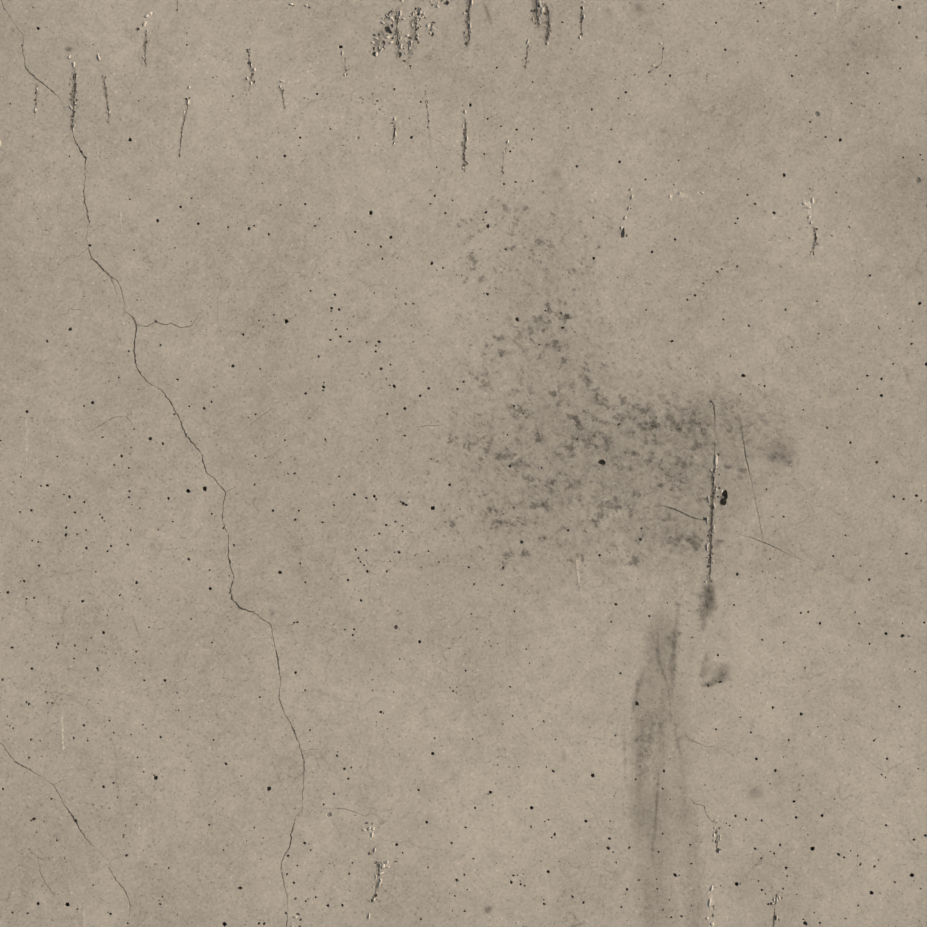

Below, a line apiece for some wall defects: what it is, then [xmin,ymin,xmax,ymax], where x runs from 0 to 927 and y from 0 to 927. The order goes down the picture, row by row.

spalling [372,0,449,67]
spalling [464,0,473,46]
spalling [530,0,552,45]
crack [0,0,316,927]